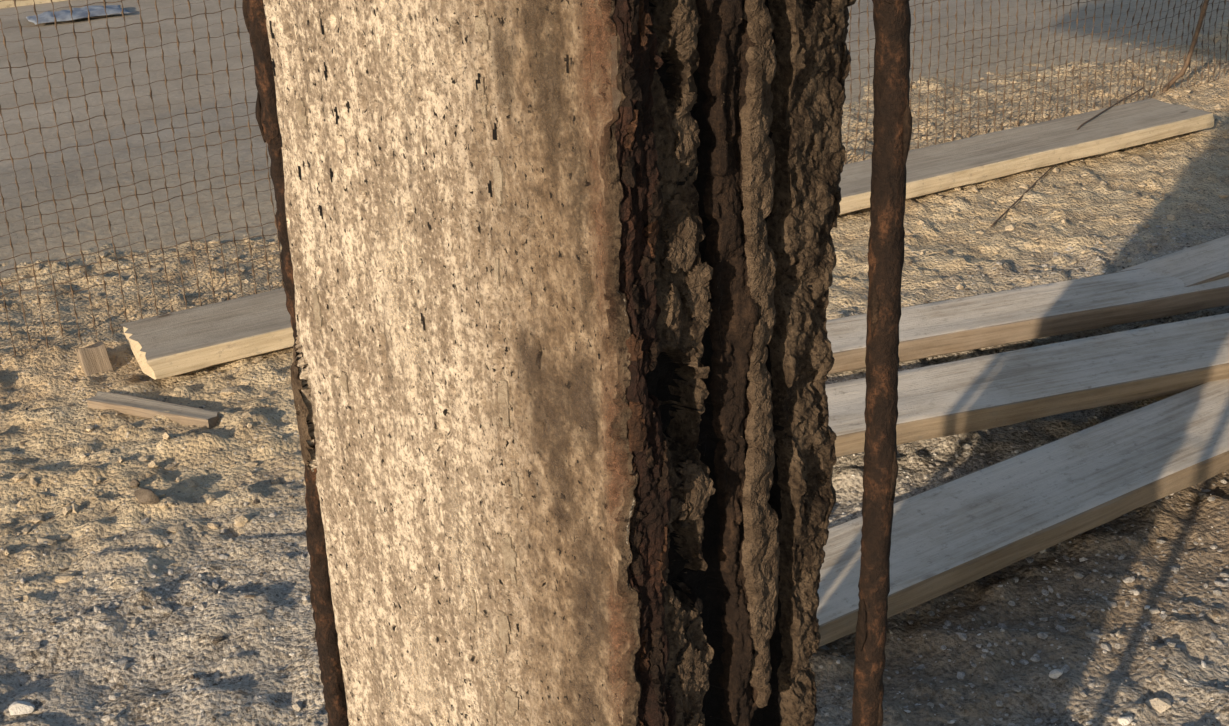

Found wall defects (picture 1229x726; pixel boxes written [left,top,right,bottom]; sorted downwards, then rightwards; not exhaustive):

rust [612,0,676,726]
spalling [598,0,716,726]
rust [695,0,759,726]
peeling [739,0,780,708]
spalling [812,356,835,381]
spalling [823,455,837,529]
spalling [831,187,842,228]
spalling [837,0,856,115]